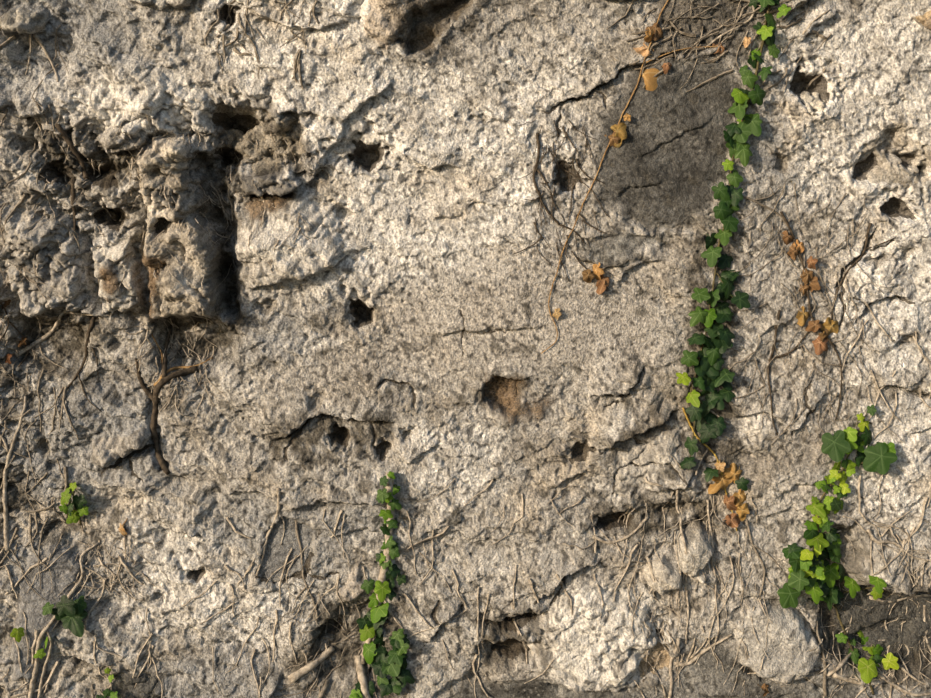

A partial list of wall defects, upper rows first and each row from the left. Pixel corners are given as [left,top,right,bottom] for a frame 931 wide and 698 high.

crack [543,66,627,137]